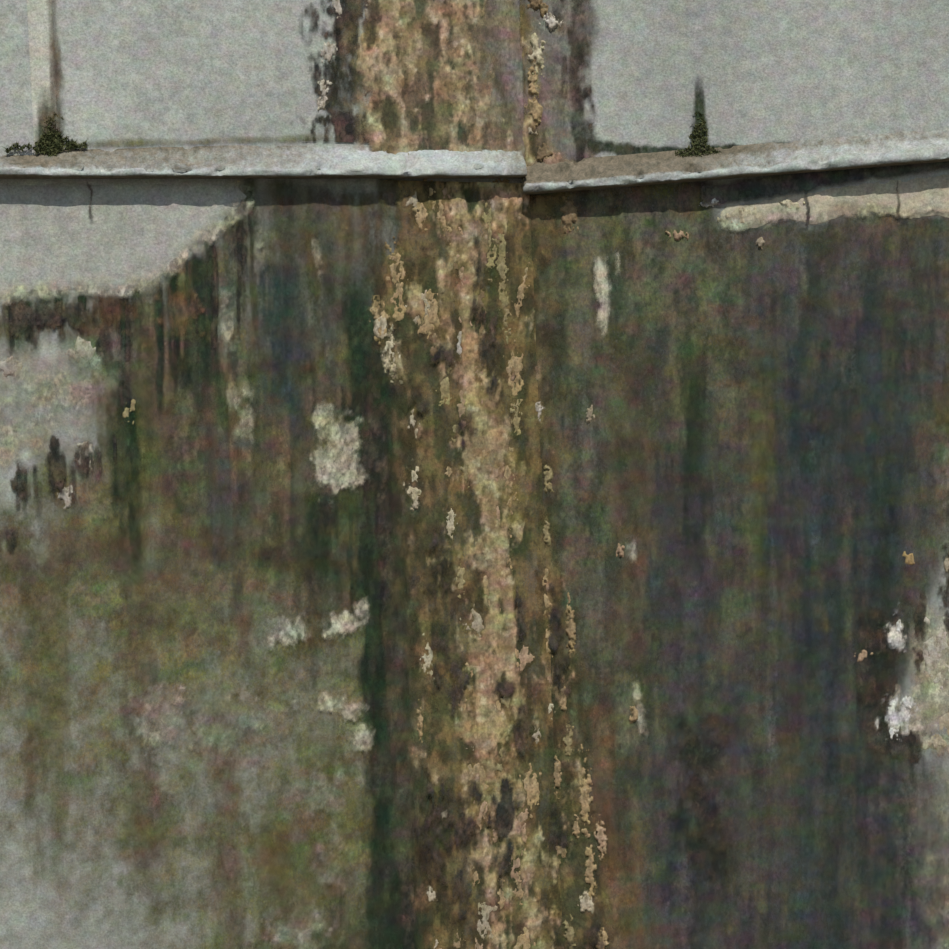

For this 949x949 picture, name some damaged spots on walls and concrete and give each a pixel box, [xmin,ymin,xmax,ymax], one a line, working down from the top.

leakage [38,40,61,154]
peeling [317,79,333,117]
peeling [320,42,338,64]
peeling [331,0,342,19]
leakage [521,0,739,163]
peeling [665,230,689,241]
crack [803,191,811,226]
peeling [700,161,949,249]
peeling [351,0,613,949]
leakage [2,179,441,949]
leakage [531,181,949,949]
spalling [854,544,949,764]